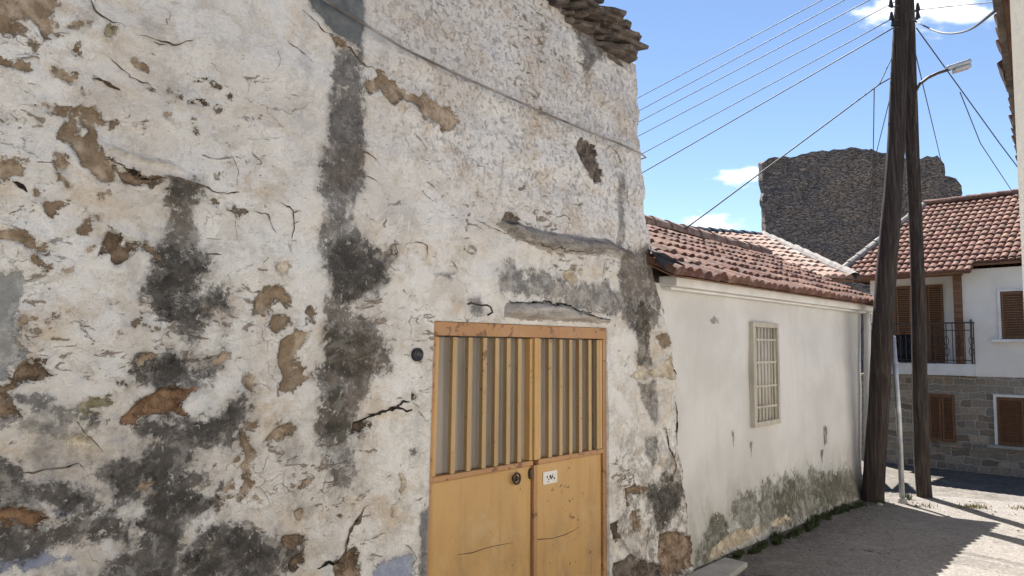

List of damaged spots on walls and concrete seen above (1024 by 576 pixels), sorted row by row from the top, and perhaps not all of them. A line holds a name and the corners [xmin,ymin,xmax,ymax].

peeling [33,66,163,223]
peeling [364,69,461,133]
peeling [576,137,603,184]
leakage [138,175,232,345]
peeling [252,244,317,397]
leakage [311,46,398,488]
leakage [501,245,661,366]
crack [352,400,412,426]
leakage [638,380,659,423]
leakage [0,392,305,576]
crack [317,506,367,569]
spalling [612,529,694,576]